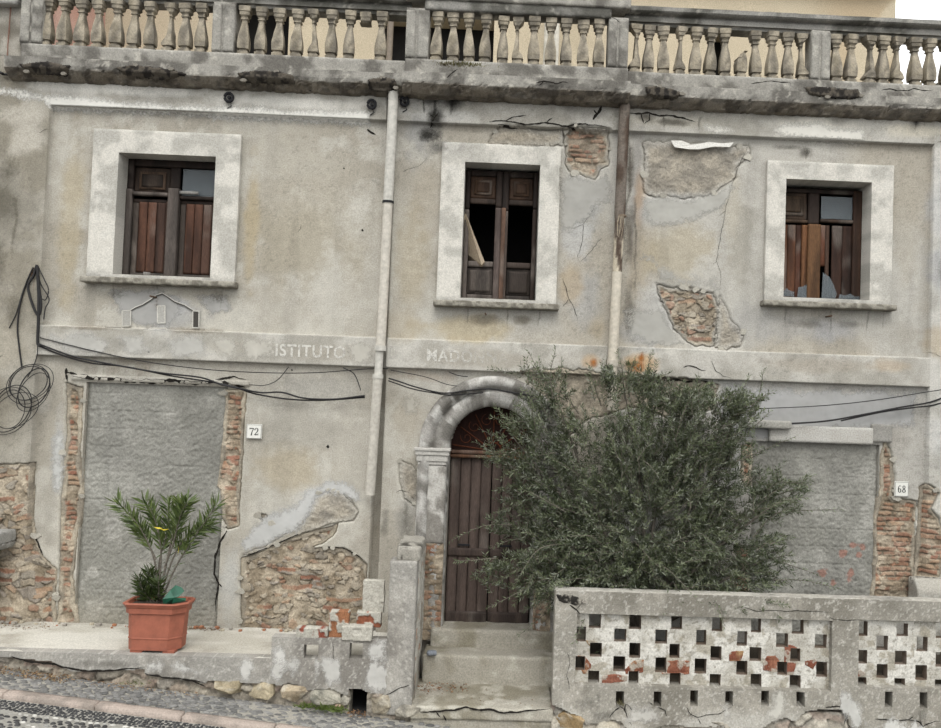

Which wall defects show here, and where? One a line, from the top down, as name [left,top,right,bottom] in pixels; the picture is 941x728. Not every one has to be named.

crack [489,106,605,131]
flaking render [488,124,612,180]
flaking render [640,124,752,200]
peeling [774,122,865,144]
flaking render [657,285,747,350]
flaking render [217,389,247,529]
flaking render [0,383,87,623]
flaking render [869,442,941,597]
flaking render [234,481,385,641]